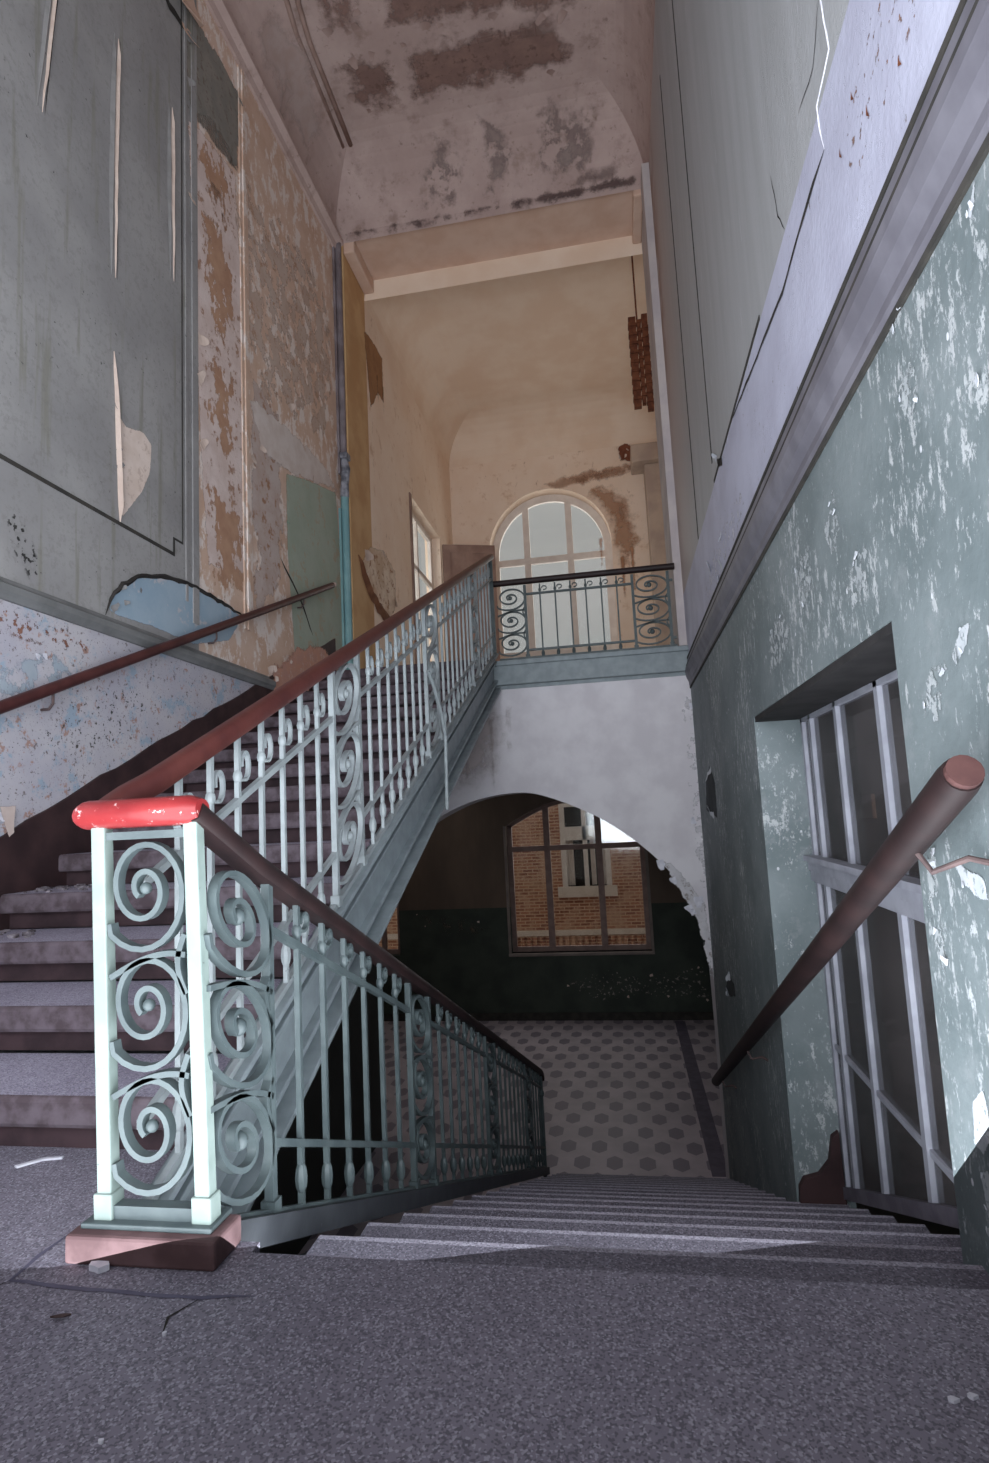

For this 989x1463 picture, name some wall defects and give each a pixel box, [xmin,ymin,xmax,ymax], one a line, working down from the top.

crack [37,0,58,112]
peeling [388,0,569,99]
rust [839,0,915,167]
crack [109,33,121,280]
crack [731,0,830,421]
flaking render [105,121,337,644]
peeling [847,548,868,612]
peeling [923,623,969,722]
peeling [0,806,16,837]
peeling [925,848,938,905]
peeling [956,865,988,900]
peeling [932,926,948,976]